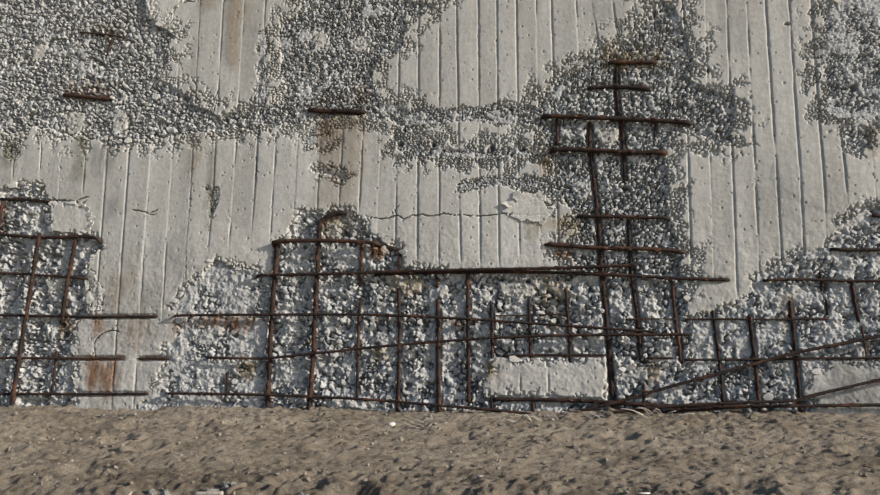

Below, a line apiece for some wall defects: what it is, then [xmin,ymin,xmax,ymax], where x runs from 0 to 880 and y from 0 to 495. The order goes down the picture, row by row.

spalling [0,0,170,136]
peeling [145,0,184,27]
spalling [173,114,239,138]
spalling [254,0,420,124]
spalling [815,0,880,153]
spalling [209,188,217,218]
crack [371,204,512,220]
peeling [502,175,612,225]
spalling [0,182,106,407]
spalling [138,205,880,413]